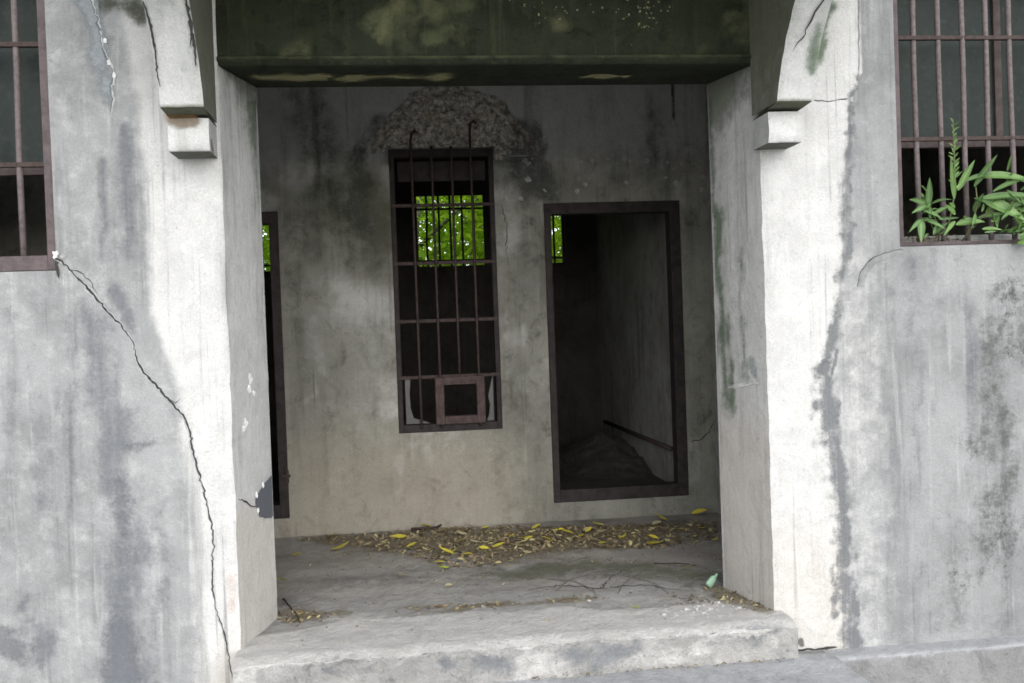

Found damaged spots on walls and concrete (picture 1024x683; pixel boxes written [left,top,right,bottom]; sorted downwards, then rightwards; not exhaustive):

crack [143,1,160,85]
crack [185,0,197,66]
crack [792,0,824,74]
spalling [253,73,540,160]
water stain [834,75,859,279]
crack [52,251,233,676]
spalling [256,475,273,518]
water stain [813,305,863,648]
water stain [108,542,148,683]
crack [529,567,677,590]